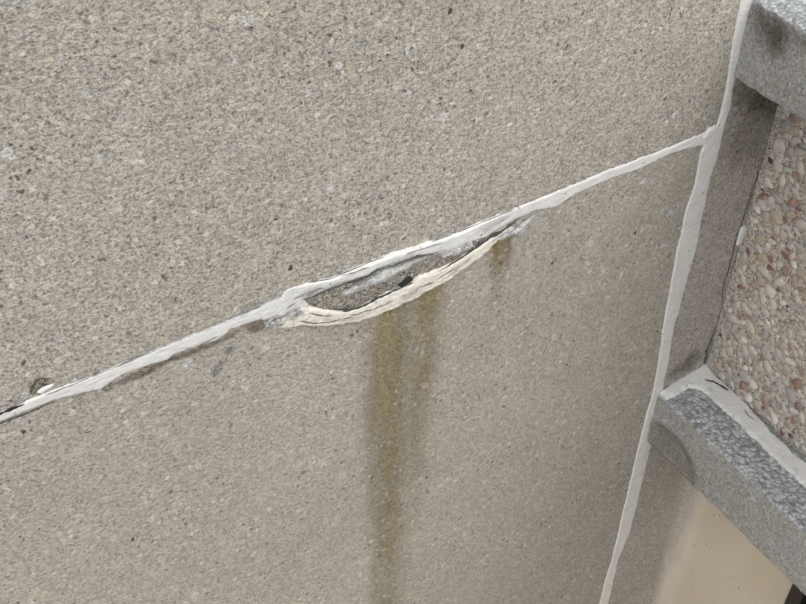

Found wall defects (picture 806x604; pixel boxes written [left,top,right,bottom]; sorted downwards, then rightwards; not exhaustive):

crack [433,209,514,241]
crack [309,257,383,283]
leakage [420,287,438,383]
crack [0,336,218,424]
leakage [375,308,401,570]